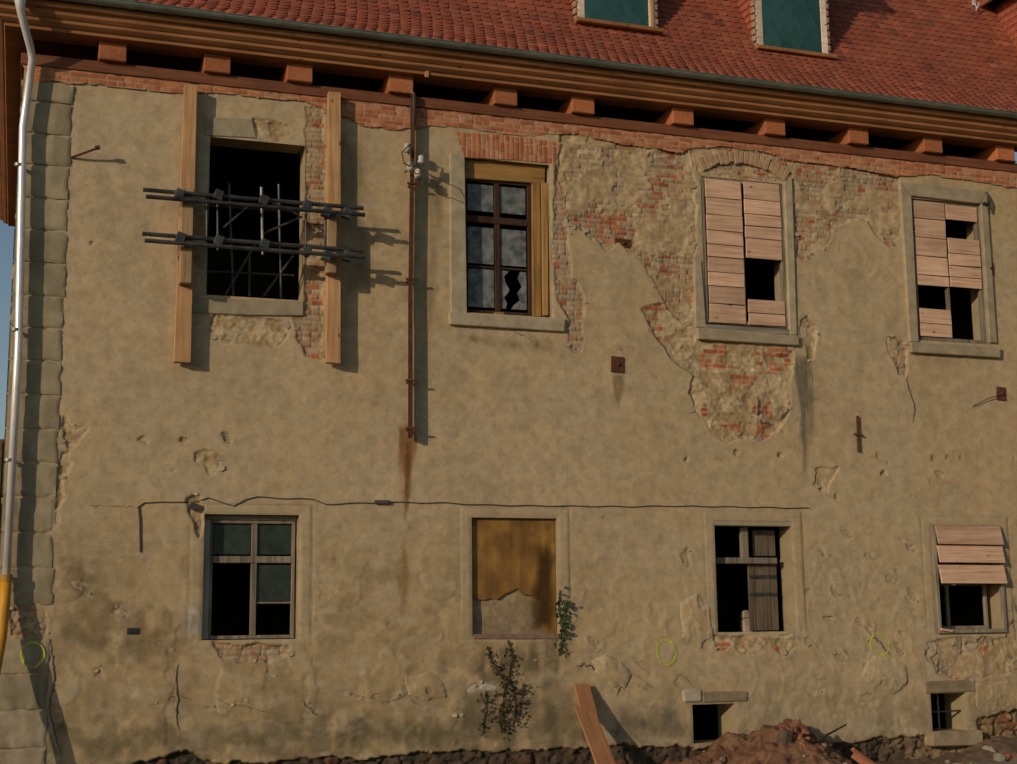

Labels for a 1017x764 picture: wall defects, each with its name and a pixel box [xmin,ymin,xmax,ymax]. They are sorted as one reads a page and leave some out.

flaking render [209,106,327,360]
flaking render [551,124,901,463]
flaking render [886,333,908,375]
crack [906,376,916,423]
flaking render [52,415,87,525]
corrosion [400,429,414,506]
flaking render [713,632,800,656]
crack [154,665,187,731]